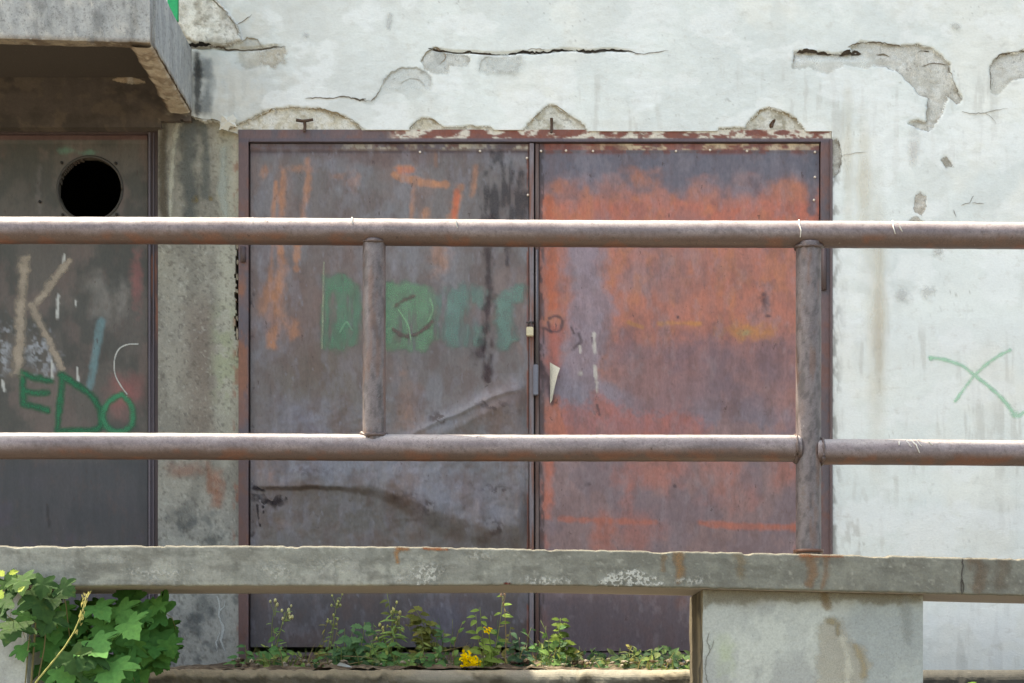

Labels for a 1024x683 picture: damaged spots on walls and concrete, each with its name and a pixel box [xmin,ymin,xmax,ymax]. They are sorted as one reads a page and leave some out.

flaking render [112,46,363,134]
crack [310,91,380,101]
crack [428,48,665,64]
flaking render [793,41,962,132]
flaking render [990,50,1024,88]
leakage [159,53,227,217]
flaking render [524,105,586,130]
flaking render [719,107,805,130]
leakage [484,154,528,219]
flaking render [910,193,926,221]
corrosion [253,486,287,527]